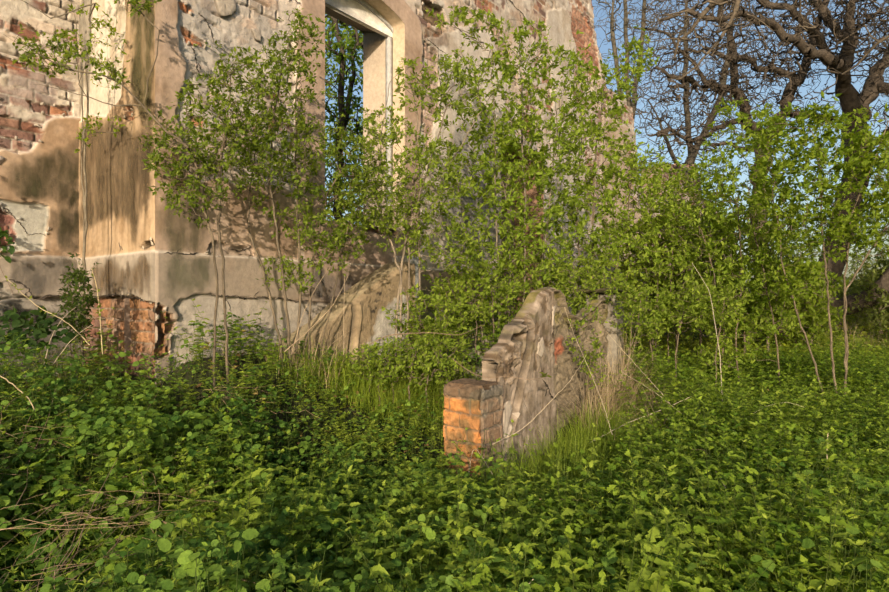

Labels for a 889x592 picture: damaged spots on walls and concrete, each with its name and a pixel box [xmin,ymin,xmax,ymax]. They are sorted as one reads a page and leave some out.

flaking render [178,0,194,16]
flaking render [0,55,24,71]
flaking render [10,18,43,45]
flaking render [179,25,207,49]
flaking render [571,4,600,76]
flaking render [0,97,74,143]
flaking render [0,198,51,252]
damp [15,122,154,293]
flaking render [96,295,177,360]